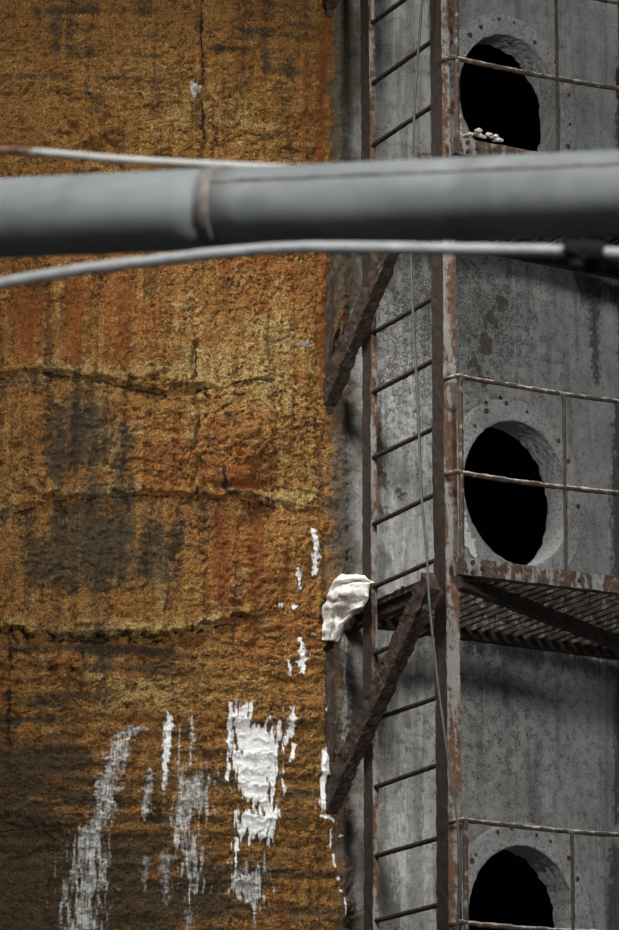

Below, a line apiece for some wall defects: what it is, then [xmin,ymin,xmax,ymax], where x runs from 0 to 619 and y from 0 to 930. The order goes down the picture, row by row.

crack [199,0,217,147]
crack [34,345,272,410]
crack [0,486,297,532]
damp [59,726,148,930]
damp [142,702,298,914]